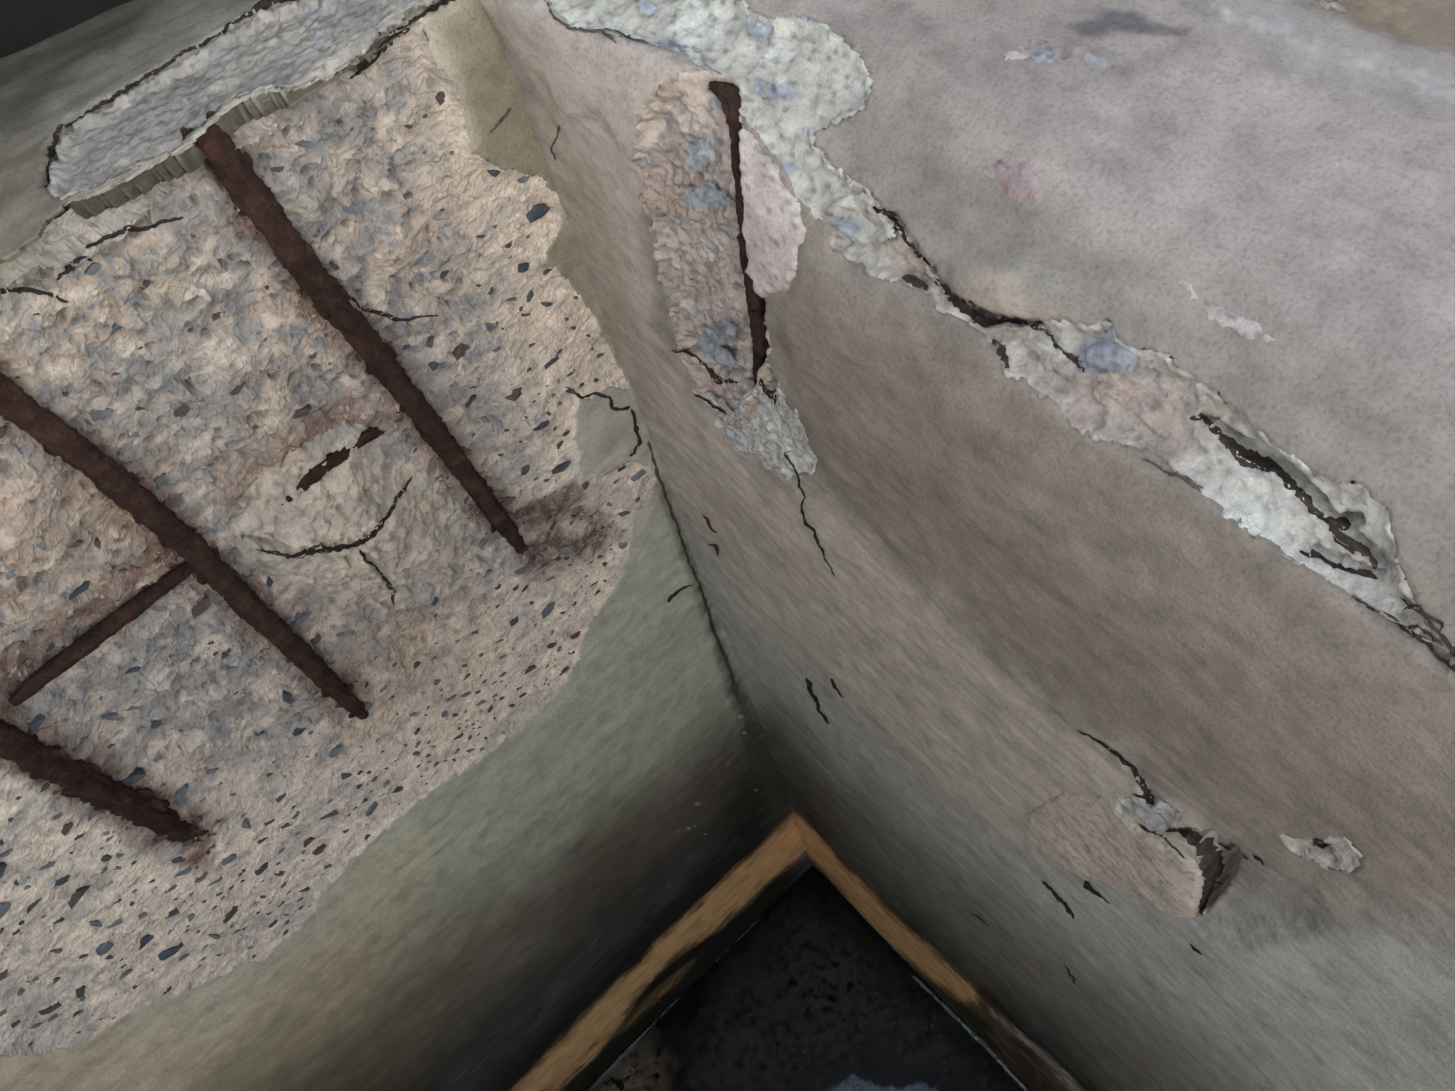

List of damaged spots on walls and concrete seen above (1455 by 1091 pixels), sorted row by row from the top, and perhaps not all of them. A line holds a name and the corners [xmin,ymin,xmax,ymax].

spalling [549,0,1435,645]
spalling [0,0,656,1056]
rust [0,555,168,732]
rust [40,729,211,864]
crack [1078,731,1154,805]
peeling [1278,833,1363,873]